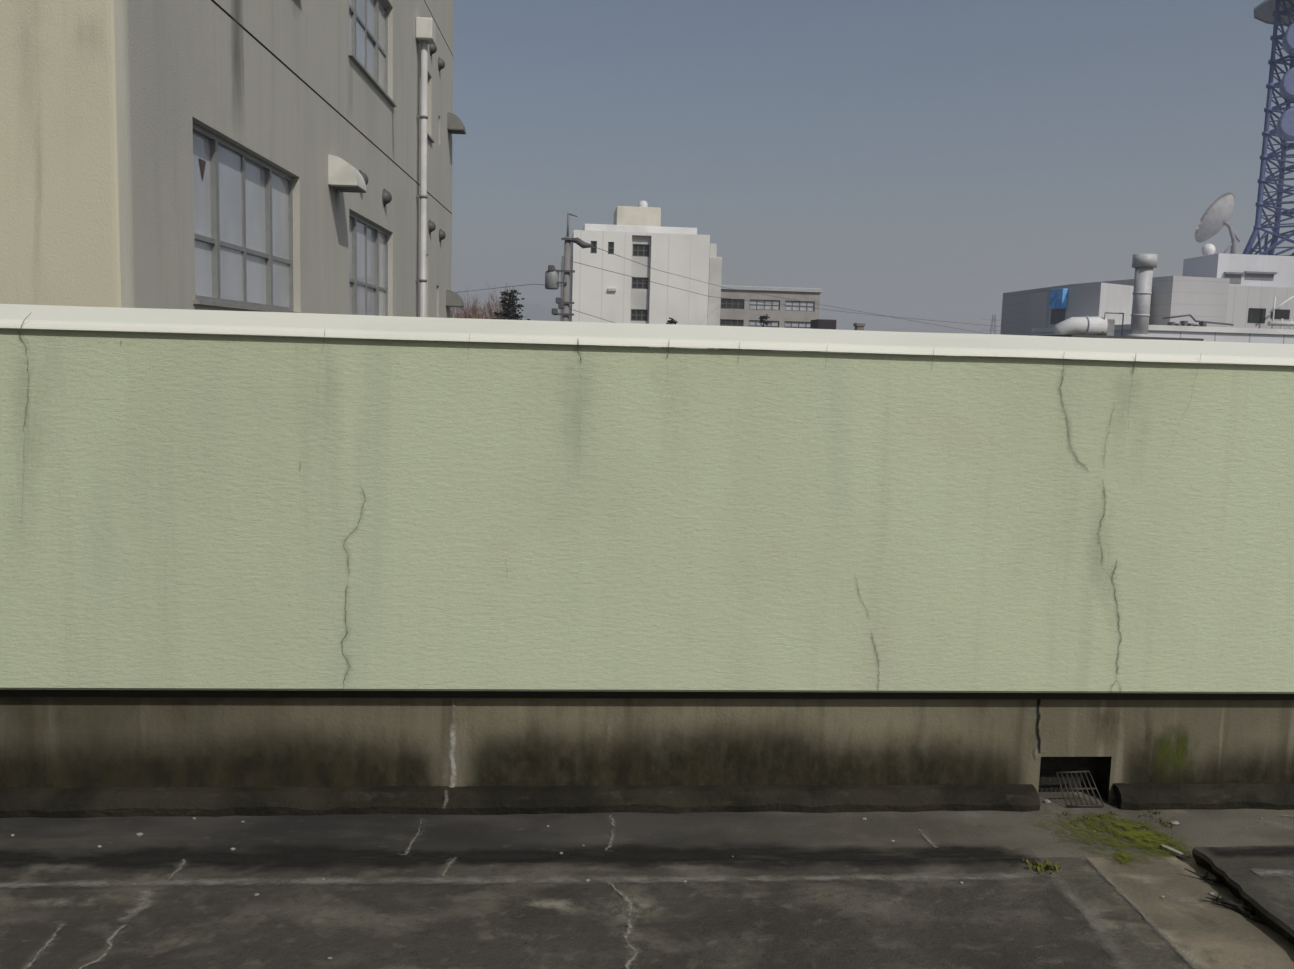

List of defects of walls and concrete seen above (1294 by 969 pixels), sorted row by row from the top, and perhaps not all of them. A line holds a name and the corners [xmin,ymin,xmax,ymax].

leakage [444,700,459,806]
crack [27,928,60,967]
crack [79,859,185,969]
crack [611,884,637,969]